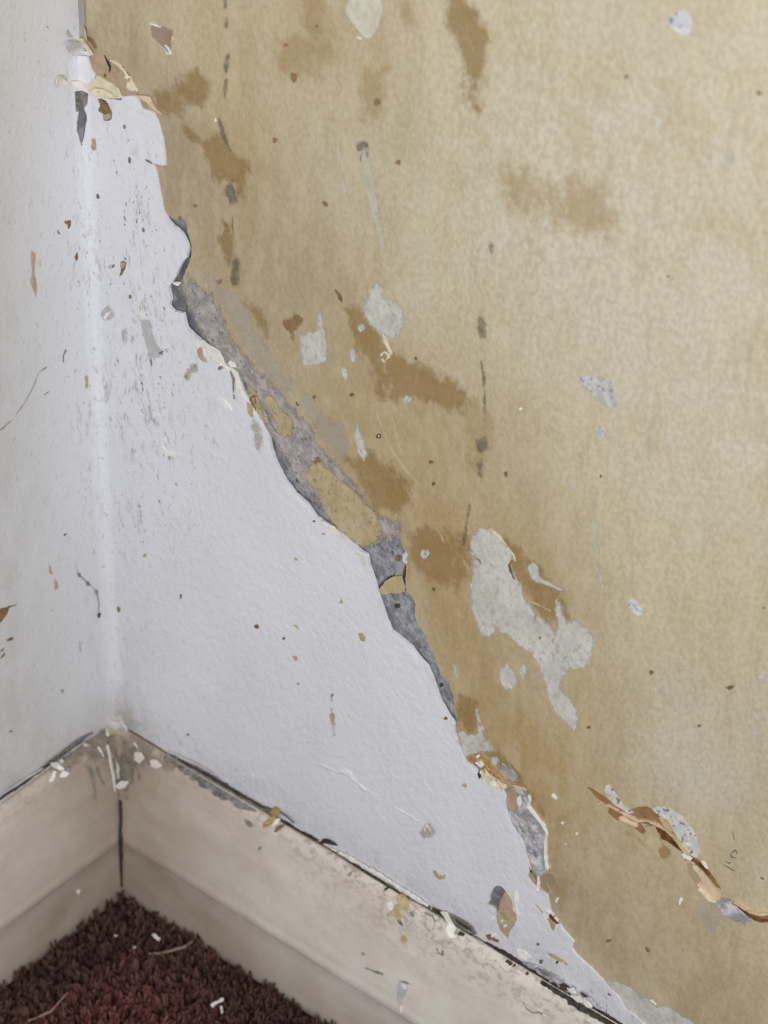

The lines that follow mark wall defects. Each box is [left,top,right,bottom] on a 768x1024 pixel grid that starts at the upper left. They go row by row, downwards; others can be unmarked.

water stain [448,0,487,89]
peeling [56,75,122,121]
water stain [157,72,206,111]
water stain [184,121,249,203]
peeling [169,216,257,419]
flaking render [358,283,403,363]
water stain [346,308,465,408]
peeling [272,437,344,539]
water stain [412,527,470,583]
water stain [506,541,566,620]
peeling [357,535,495,757]
flaking render [470,528,595,731]